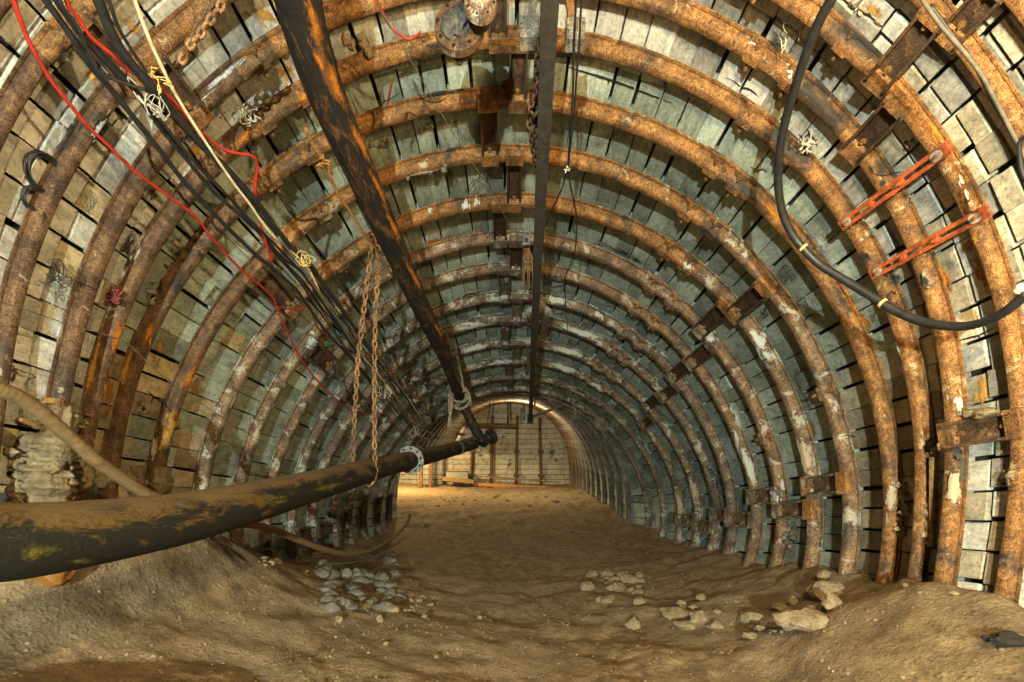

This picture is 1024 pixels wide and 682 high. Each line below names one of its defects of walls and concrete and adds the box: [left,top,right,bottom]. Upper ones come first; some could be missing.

rust [308,1,321,39]
rust [277,67,306,108]
rust [314,53,344,102]
rust [353,126,387,202]
rust [962,236,986,286]
rust [840,285,872,329]
rust [144,323,169,361]
rust [80,323,131,418]
rust [181,356,205,394]
rust [974,372,990,408]
rust [159,413,180,450]